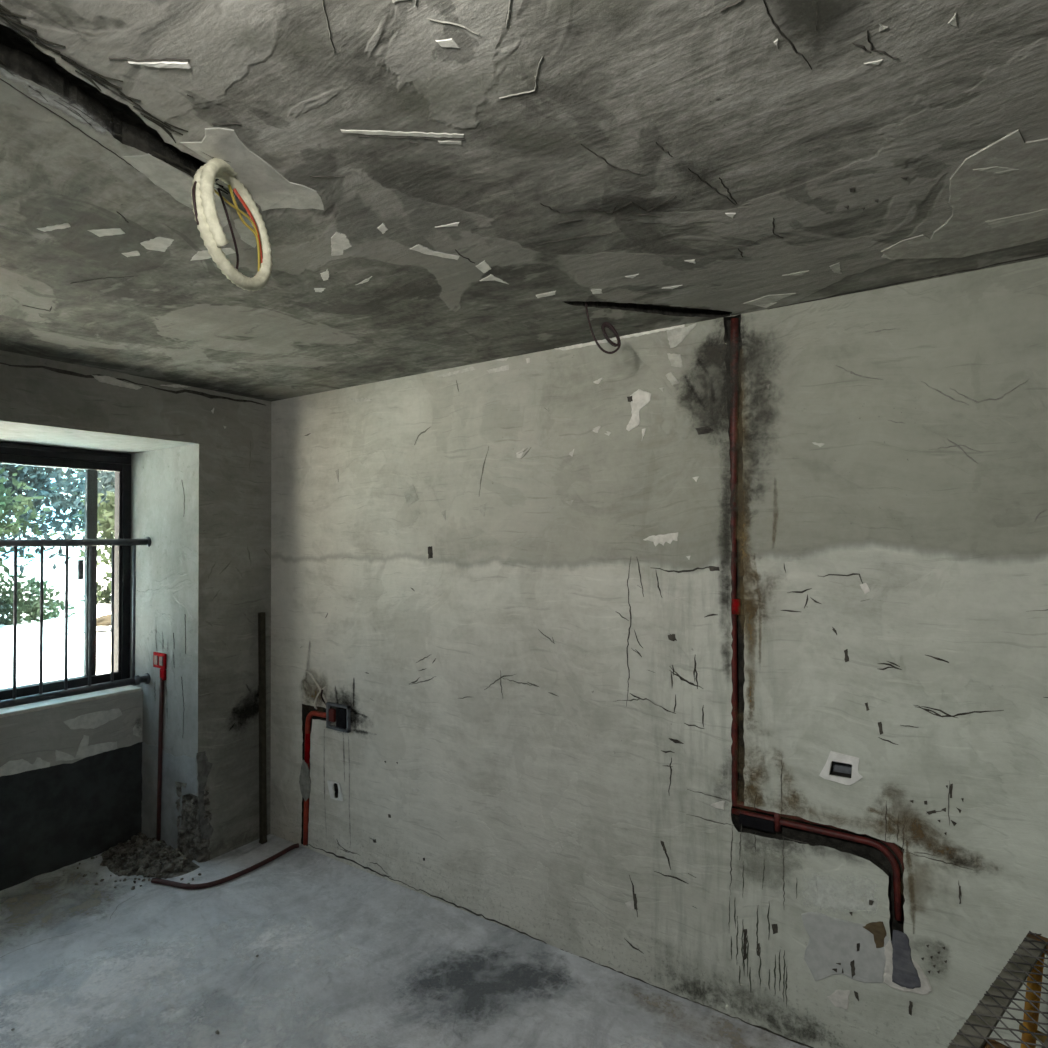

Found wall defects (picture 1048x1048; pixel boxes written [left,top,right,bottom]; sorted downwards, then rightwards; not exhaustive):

crack [108,57,191,69]
leakage [763,0,850,70]
crack [769,253,1048,309]
leakage [680,338,738,433]
crack [781,565,870,612]
peeling [0,708,122,777]
leakage [330,679,366,733]
crack [615,559,783,895]
crack [865,702,1004,745]
spalling [175,782,212,863]
leakage [728,861,787,1007]
leakage [413,951,569,1022]